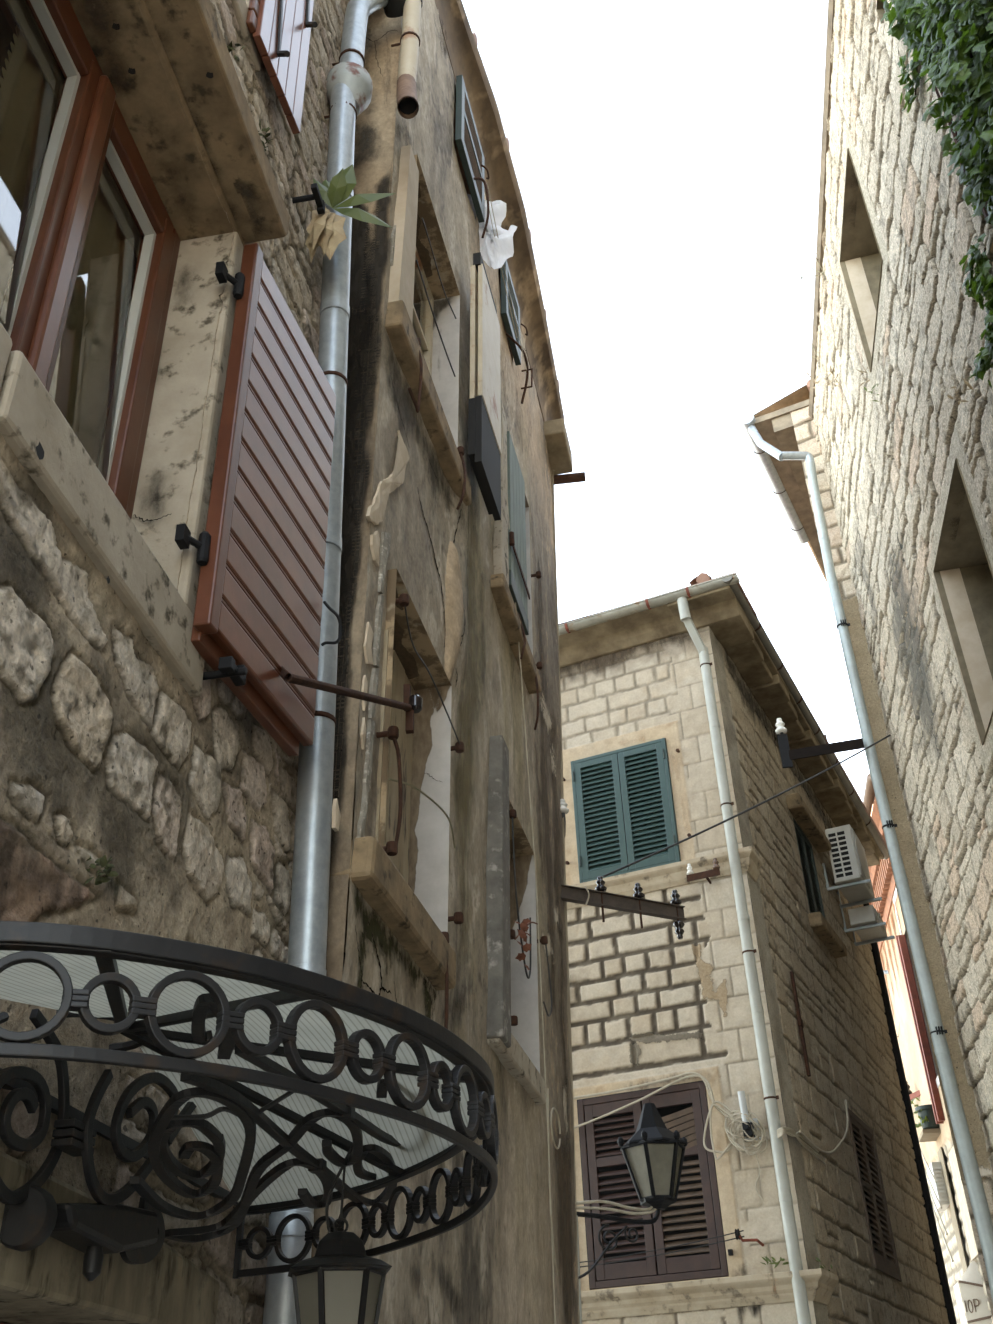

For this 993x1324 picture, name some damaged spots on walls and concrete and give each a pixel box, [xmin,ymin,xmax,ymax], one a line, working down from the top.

damp [329,175,484,879]